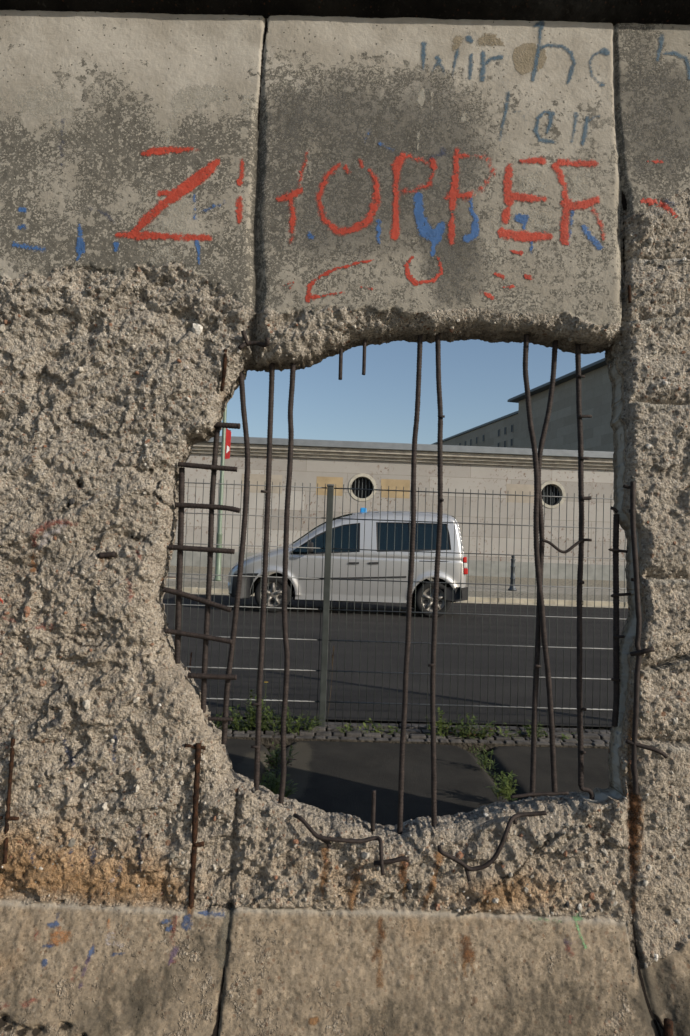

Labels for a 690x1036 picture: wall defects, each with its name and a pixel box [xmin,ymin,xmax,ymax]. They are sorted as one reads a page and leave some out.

crack [258,18,268,131]
peeling [478,33,547,75]
spalling [0,187,690,972]
corrosion [627,710,643,878]
corrosion [398,855,408,899]
crack [476,840,550,902]
crack [212,967,225,1036]
crack [632,916,664,1036]